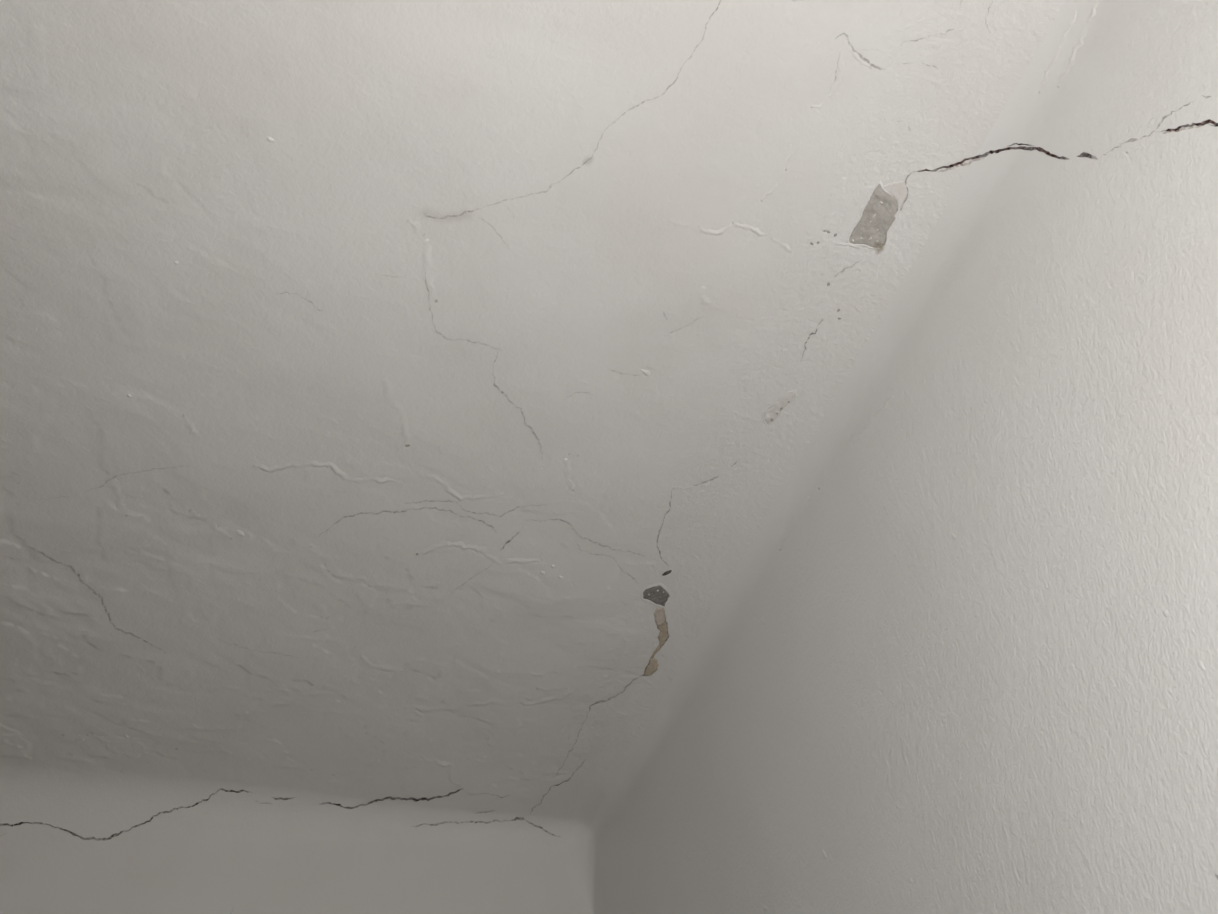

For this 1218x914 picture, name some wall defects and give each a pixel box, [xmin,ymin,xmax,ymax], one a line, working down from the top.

crack [918,143,1092,172]
crack [1126,117,1218,154]
spalling [810,177,908,252]
spalling [636,568,674,676]
crack [3,789,247,840]
crack [329,790,460,826]